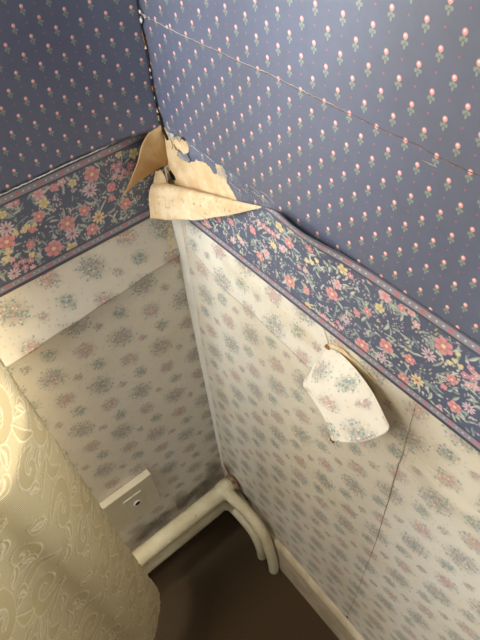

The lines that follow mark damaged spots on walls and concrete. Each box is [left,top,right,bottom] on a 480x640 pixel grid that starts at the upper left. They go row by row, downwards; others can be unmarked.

crack [138,0,480,176]
peeling [124,125,261,250]